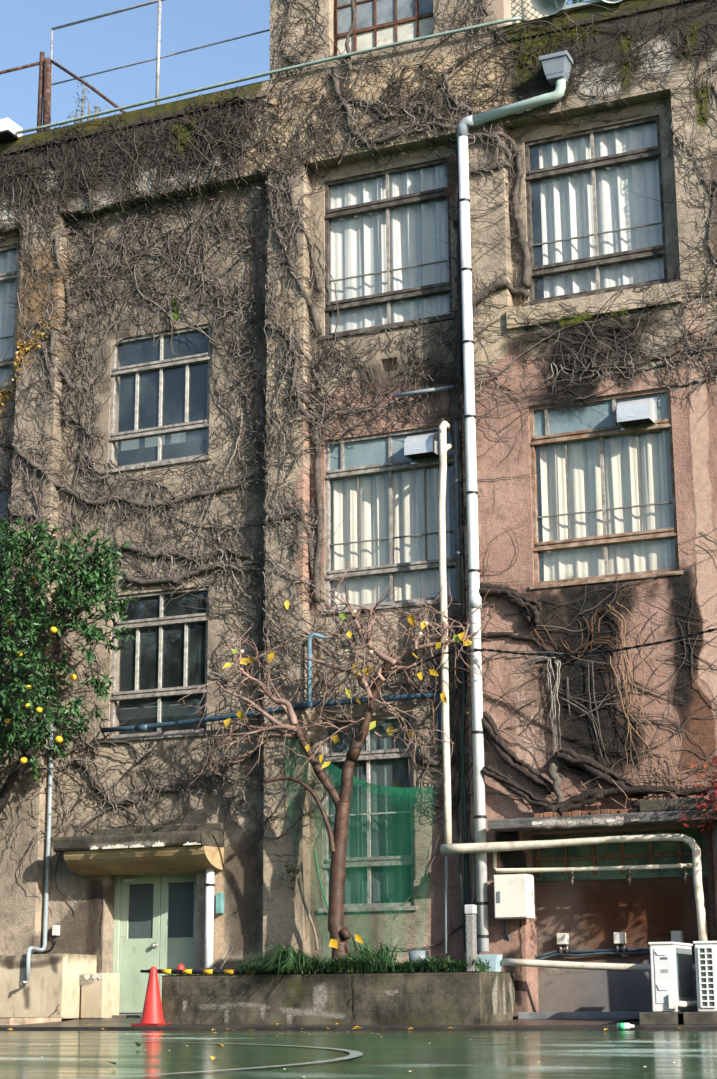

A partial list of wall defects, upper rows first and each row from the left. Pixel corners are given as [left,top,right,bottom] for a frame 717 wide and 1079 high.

damp [505,309,661,407]
damp [668,302,717,774]
damp [509,582,640,774]